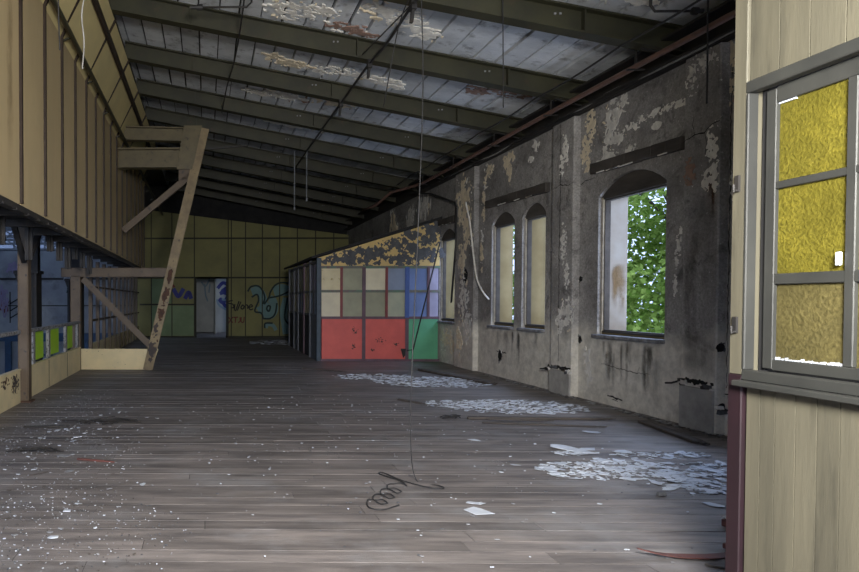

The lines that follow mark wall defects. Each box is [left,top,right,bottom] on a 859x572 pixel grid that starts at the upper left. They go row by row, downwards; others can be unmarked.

peeling [262,0,444,43]
peeling [580,47,719,173]
peeling [559,134,569,177]
peeling [701,120,719,194]
spalling [540,364,572,375]
spalling [665,377,715,391]